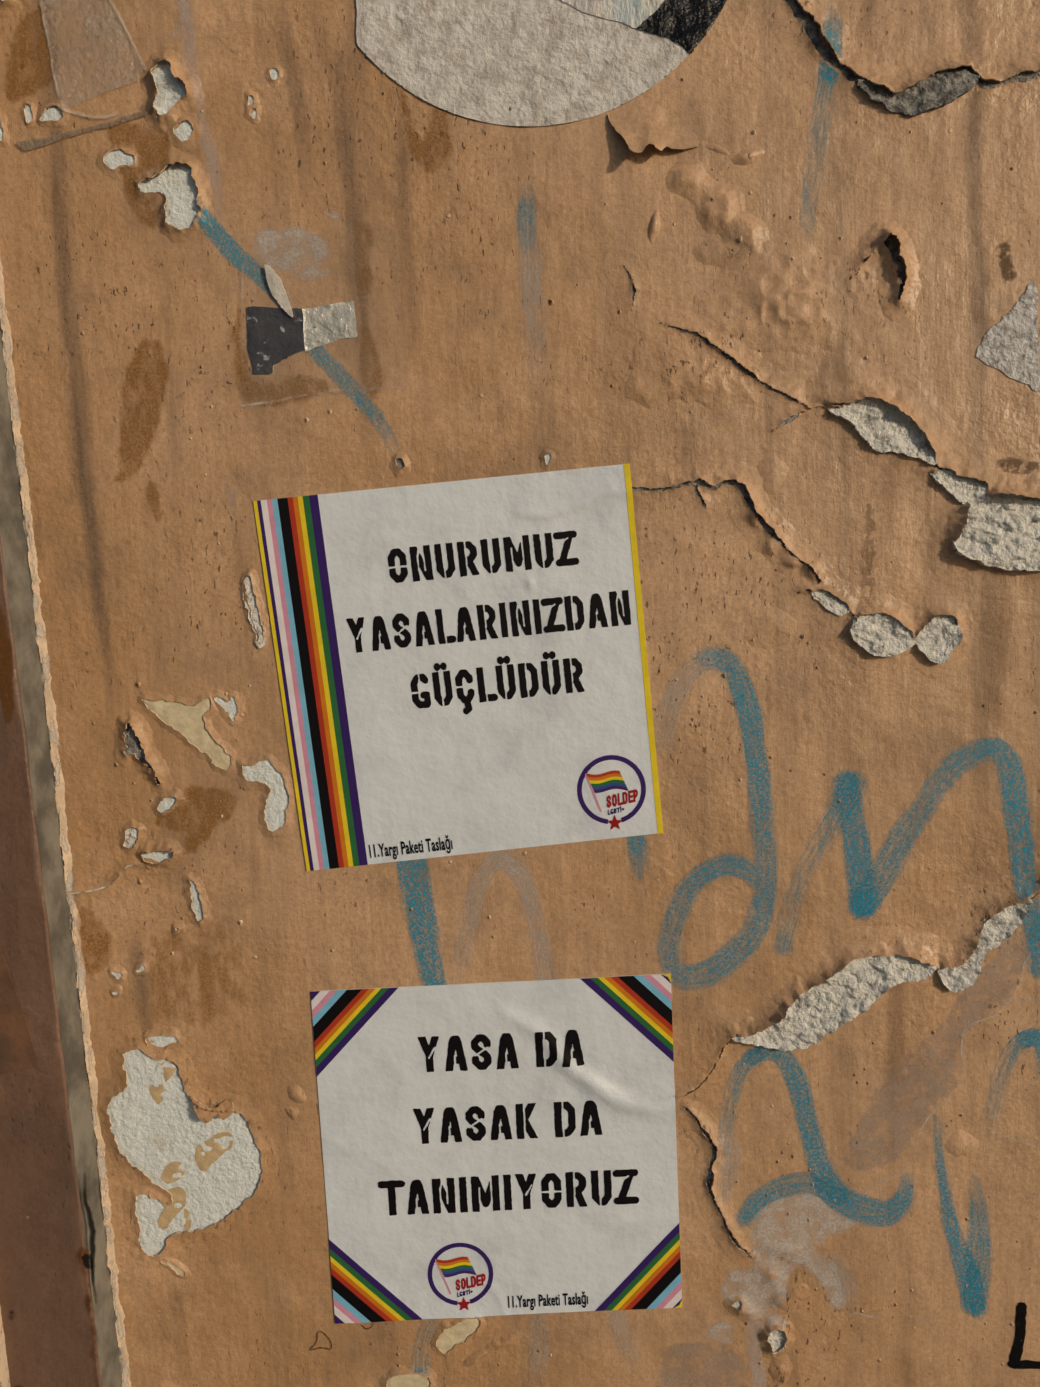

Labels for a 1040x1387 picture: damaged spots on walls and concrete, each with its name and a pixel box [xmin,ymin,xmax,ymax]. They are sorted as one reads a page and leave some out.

spalling [96,50,214,244]
peeling [608,104,700,153]
spalling [832,217,922,323]
spalling [0,299,25,476]
crack [601,247,1040,679]
spalling [24,509,44,638]
spalling [49,719,61,786]
spalling [112,689,296,937]
spalling [61,829,279,1279]
crack [673,830,1040,1273]
spalling [0,1306,11,1387]
spalling [112,1271,130,1387]